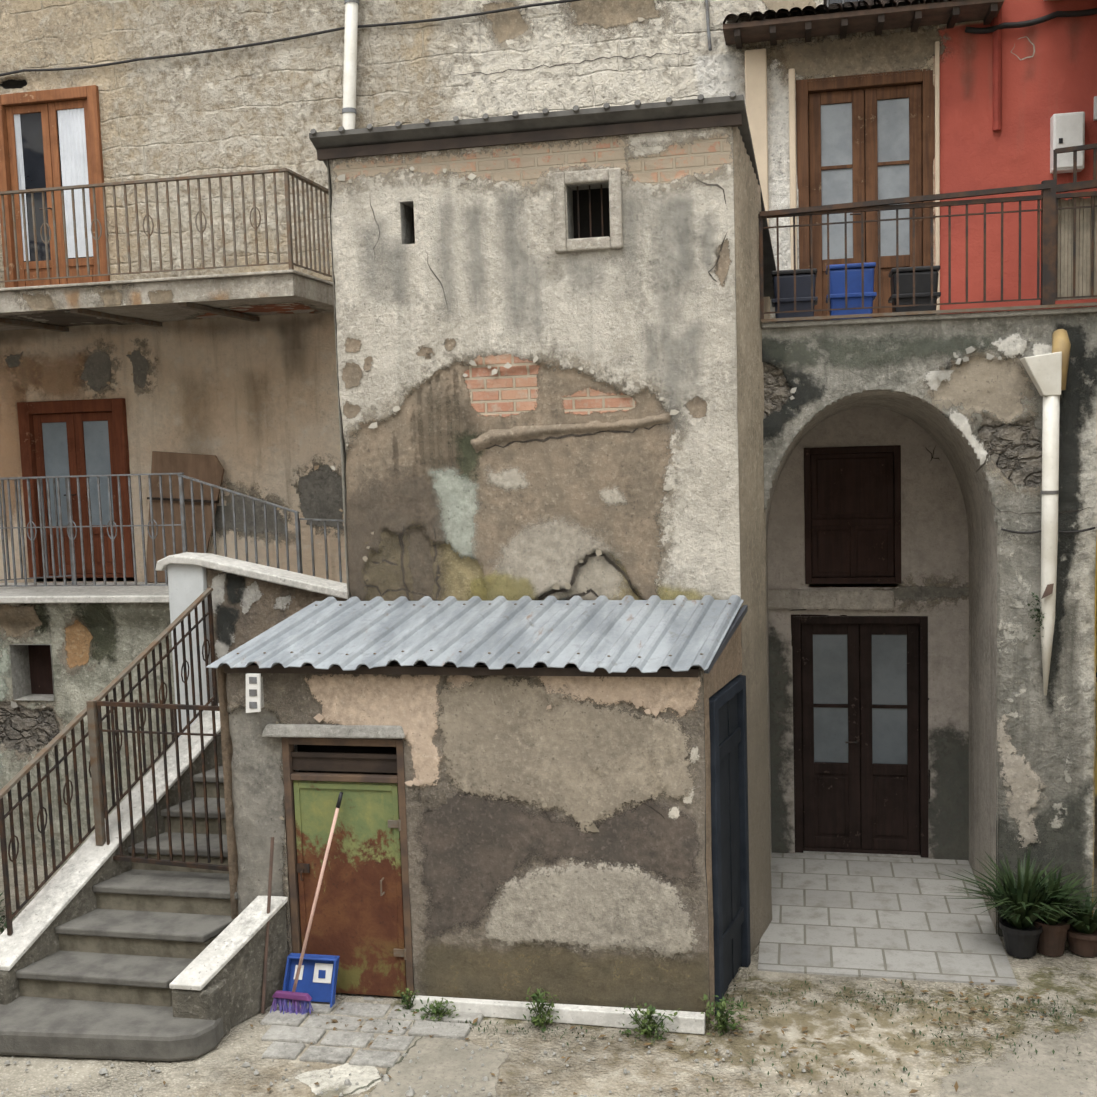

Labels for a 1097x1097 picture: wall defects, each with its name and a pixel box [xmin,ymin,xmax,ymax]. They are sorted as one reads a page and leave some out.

flaking render [477,0,533,51]
flaking render [559,0,670,40]
spalling [3,284,131,327]
flaking render [74,340,156,397]
water stain [762,335,992,441]
flaking render [211,338,707,601]
spalling [58,614,96,676]
peeling [631,697,660,717]
flaking render [690,745,701,764]
flaking render [668,786,696,819]
flaking render [997,714,1049,848]